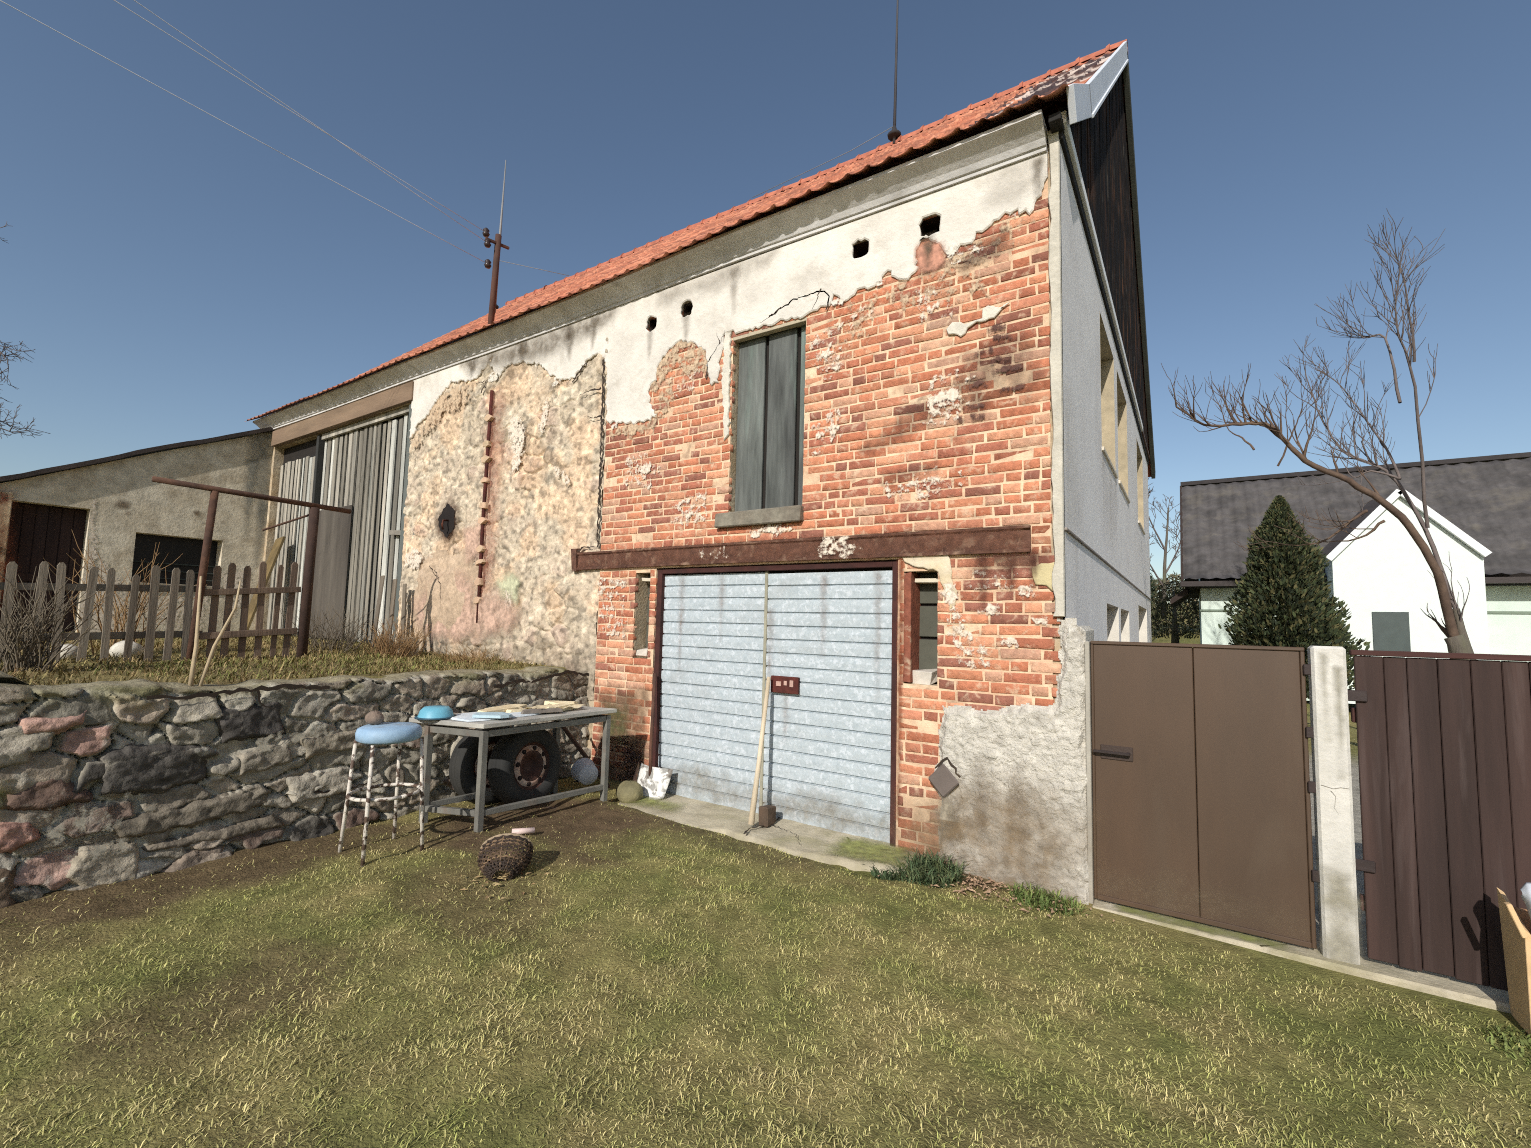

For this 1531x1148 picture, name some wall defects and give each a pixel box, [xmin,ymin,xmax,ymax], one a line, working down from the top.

flaking render [409,152,1048,452]
peeling [404,548,422,569]
spalling [436,503,481,560]
rust [818,536,866,559]
peeling [941,583,958,610]
flaking render [934,617,1089,905]